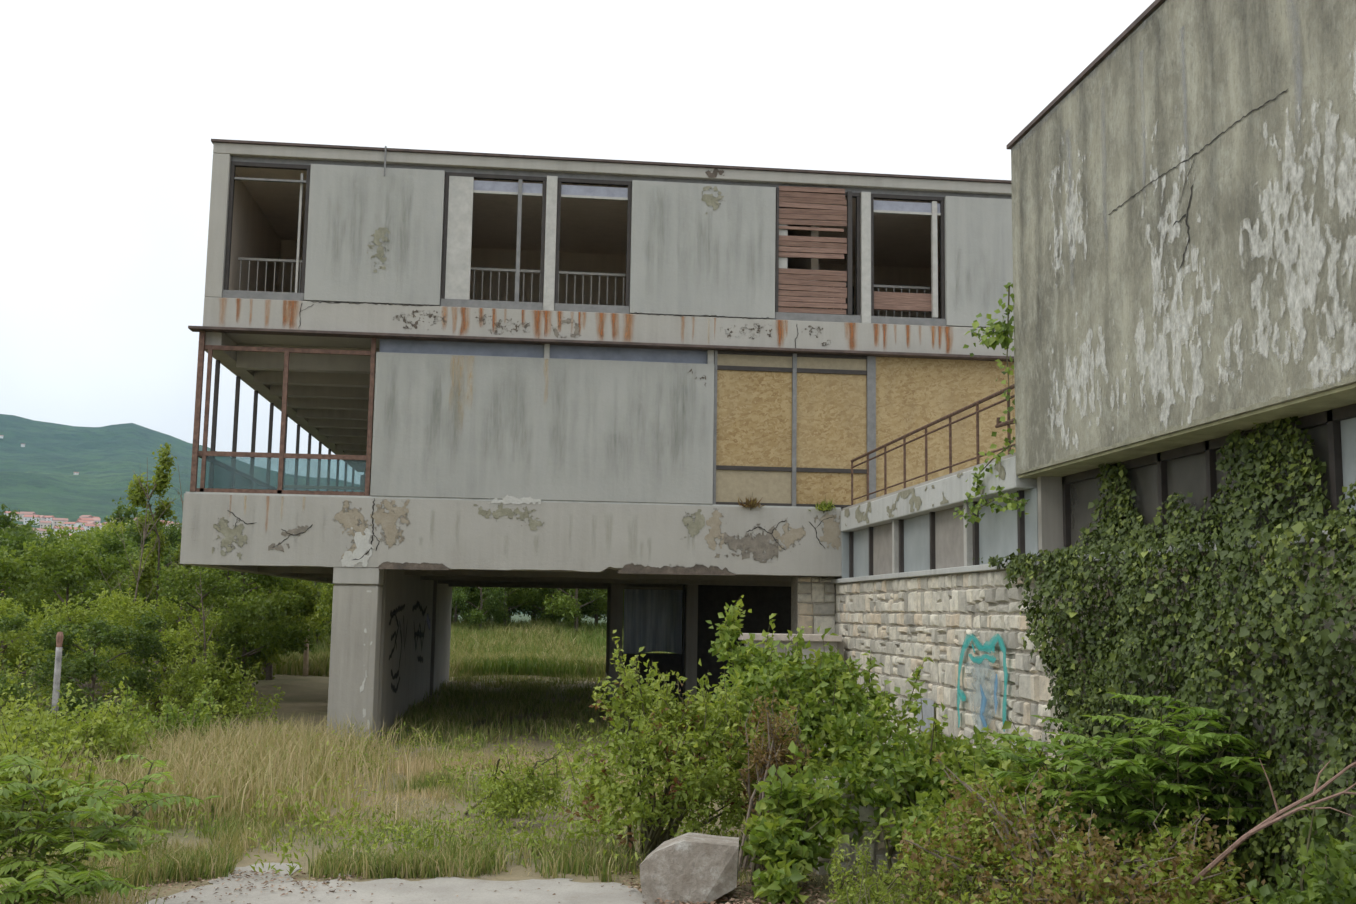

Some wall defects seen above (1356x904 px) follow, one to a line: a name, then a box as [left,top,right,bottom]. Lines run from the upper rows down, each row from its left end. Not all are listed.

peeling [701,168,725,214]
crack [1108,89,1288,269]
corrosion [443,307,506,333]
corrosion [522,310,561,333]
corrosion [579,312,630,338]
corrosion [932,326,950,351]
water stain [1020,374,1356,474]
peeling [212,517,248,559]
peeling [268,525,309,552]
peeling [334,499,449,570]
peeling [474,495,544,530]
peeling [618,485,948,575]